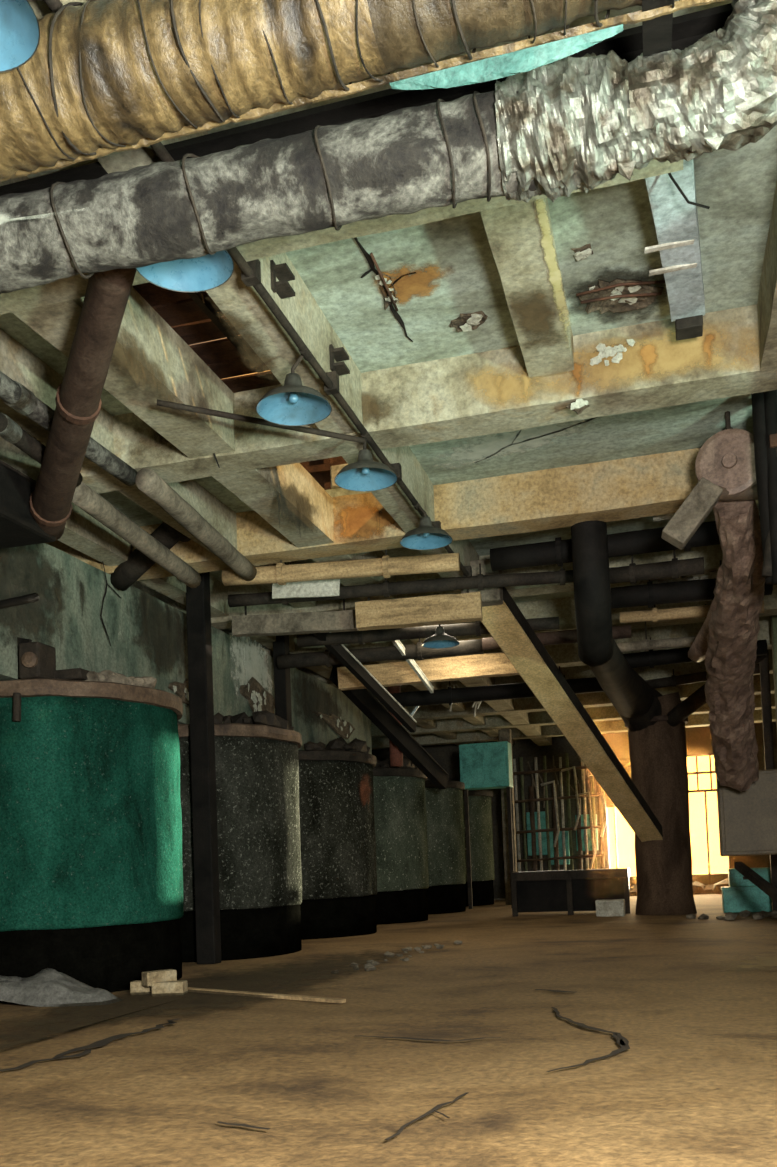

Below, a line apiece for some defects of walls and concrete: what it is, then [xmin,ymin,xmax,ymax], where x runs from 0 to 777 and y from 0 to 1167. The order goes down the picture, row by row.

rust [382,265,445,304]
peeling [590,339,635,366]
crack [53,1049,91,1059]
crack [546,1007,630,1072]